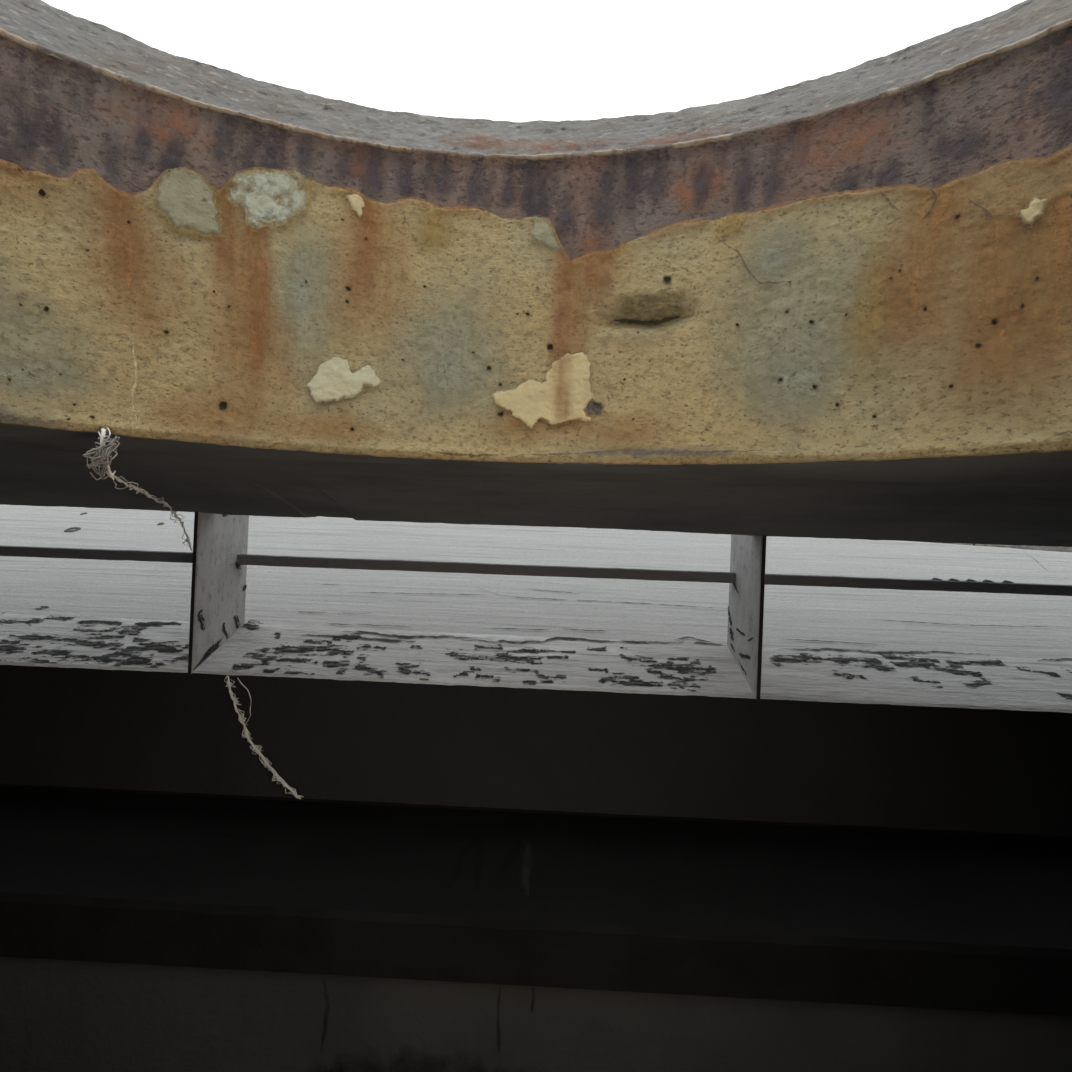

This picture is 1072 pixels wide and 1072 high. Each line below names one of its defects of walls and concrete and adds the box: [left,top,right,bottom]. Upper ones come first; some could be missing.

peeling [155,167,311,236]
peeling [1018,198,1047,228]
peeling [306,357,382,402]
peeling [492,344,602,429]